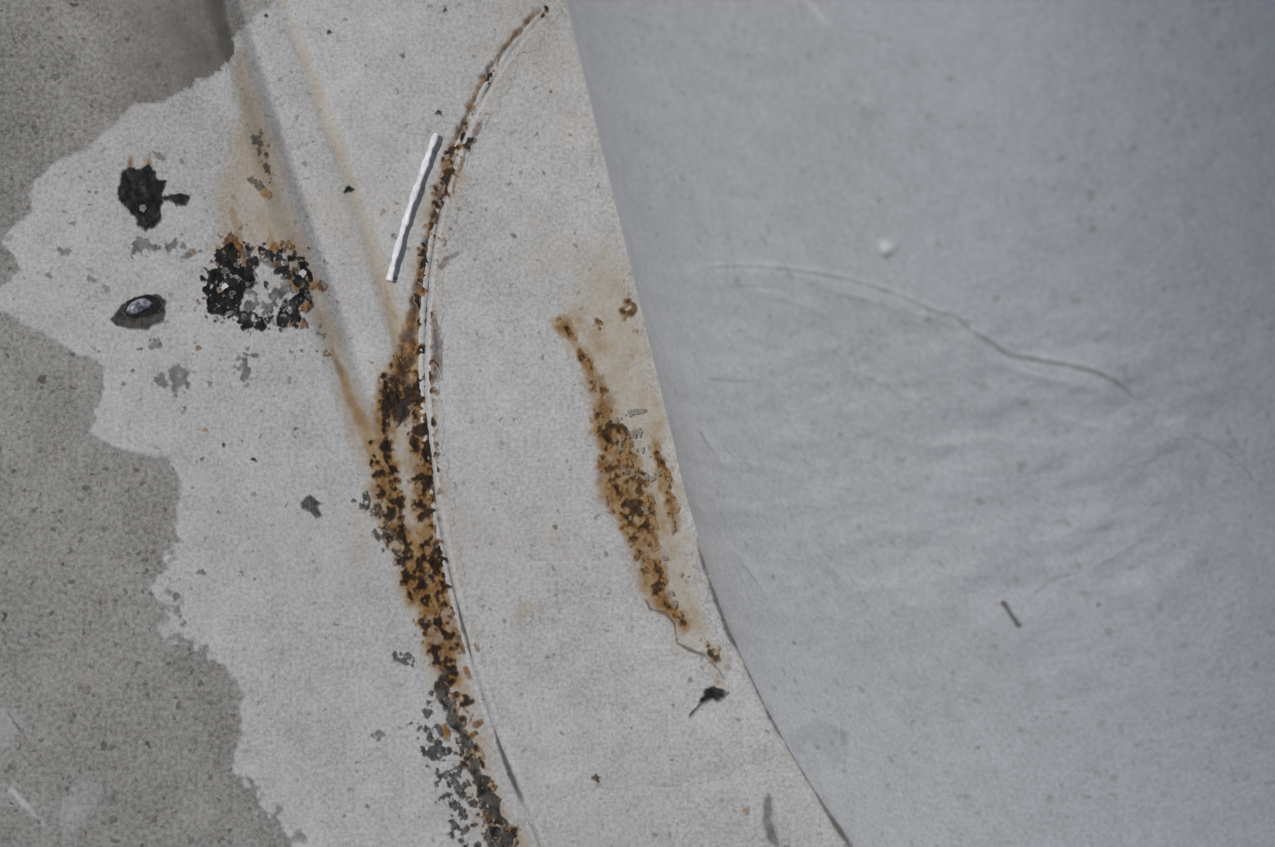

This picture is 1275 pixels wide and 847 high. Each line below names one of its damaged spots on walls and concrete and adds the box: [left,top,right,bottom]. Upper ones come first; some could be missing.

peeling [246,128,273,200]
peeling [56,247,72,256]
peeling [116,150,331,383]
peeling [153,340,197,399]
corrosion [189,0,563,847]
corrosion [547,224,729,679]
spalling [299,494,323,519]
spalling [369,729,386,742]
peeling [740,792,782,847]